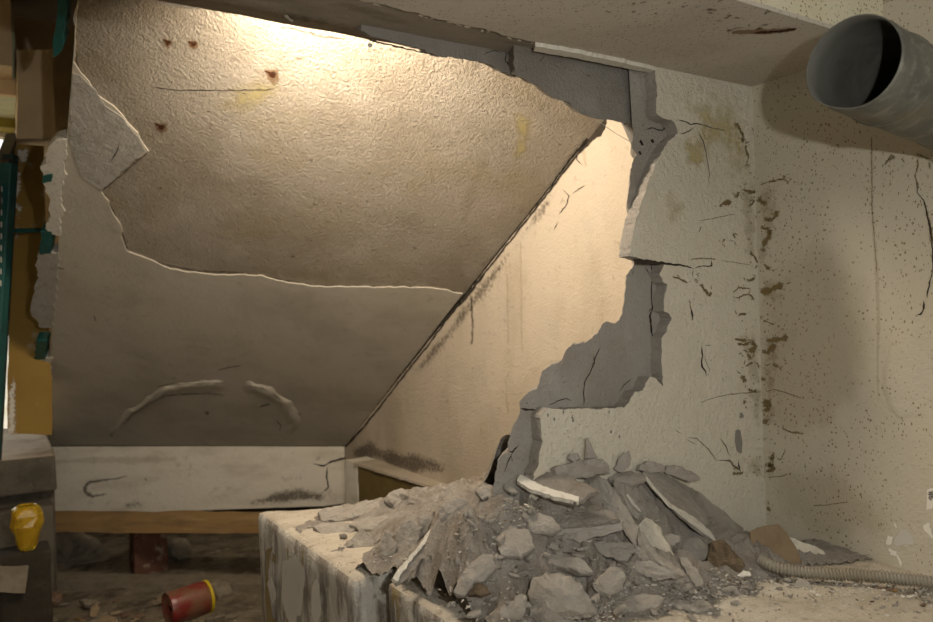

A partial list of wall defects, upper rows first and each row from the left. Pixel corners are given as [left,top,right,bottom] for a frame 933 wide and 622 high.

peeling [53,0,72,57]
rust [265,70,278,82]
crack [639,120,725,175]
peeling [16,148,29,214]
peeling [30,50,146,370]
crack [313,120,606,492]
crack [632,257,713,336]
leakage [691,113,800,424]
crack [914,159,933,315]
peeling [7,381,16,435]
crack [677,431,743,476]
leakage [749,449,791,478]